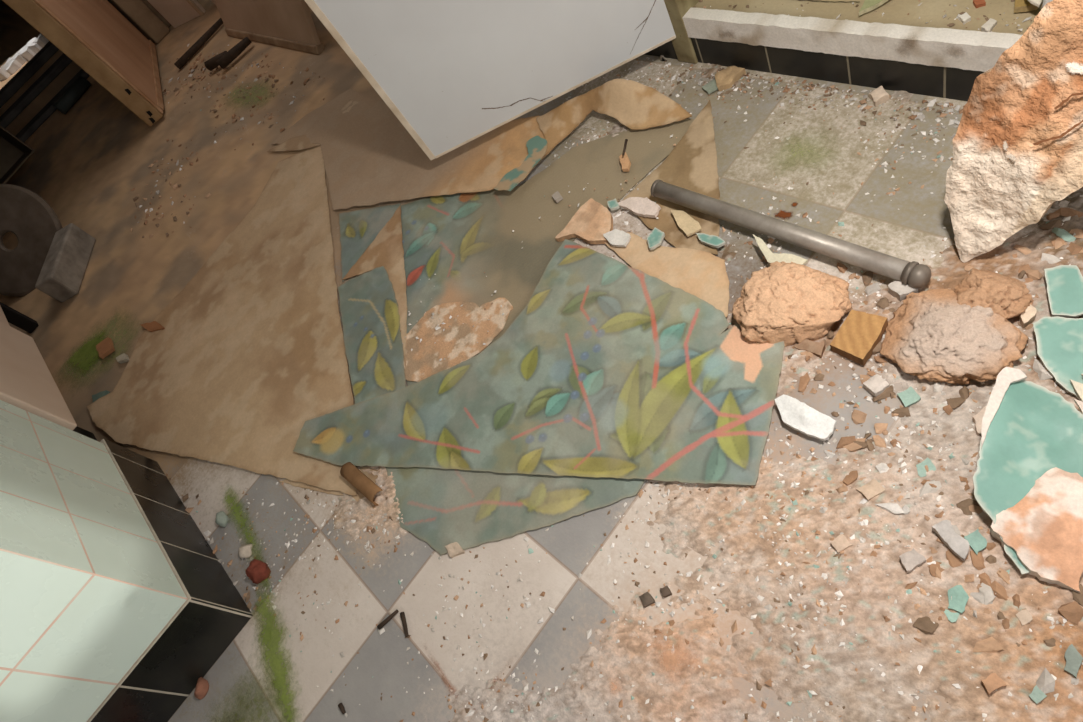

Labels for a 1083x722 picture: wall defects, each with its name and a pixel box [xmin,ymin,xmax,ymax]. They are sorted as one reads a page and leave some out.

peeling [494,136,547,191]
flaking render [619,152,631,172]
flaking render [603,197,726,250]